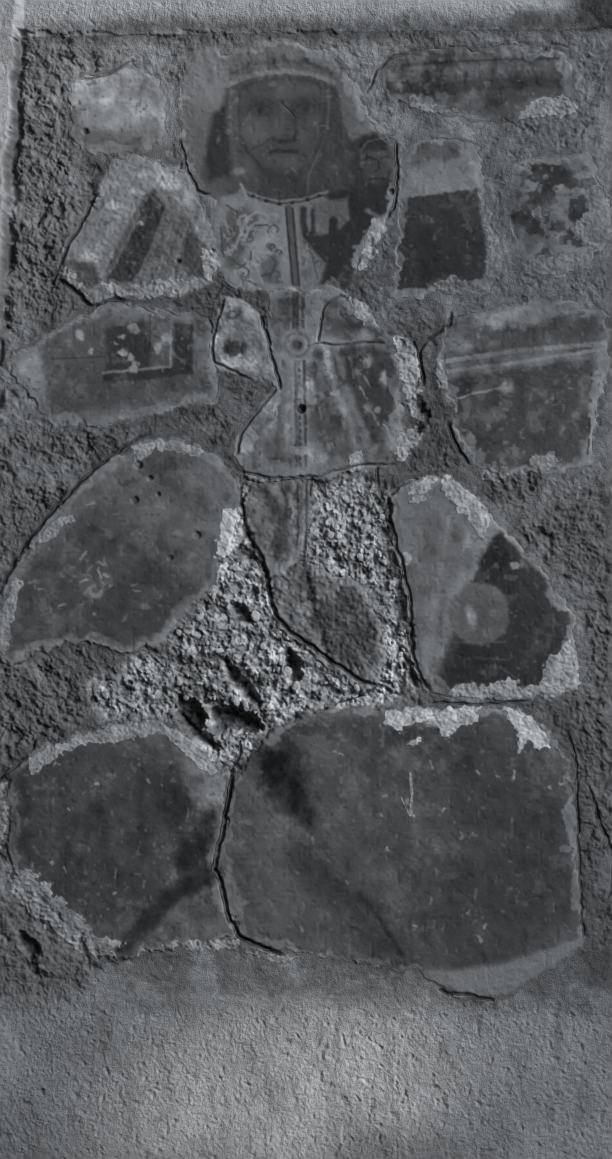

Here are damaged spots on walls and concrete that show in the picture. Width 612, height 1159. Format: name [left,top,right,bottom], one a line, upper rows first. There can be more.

peeling [358,217,387,271]
peeling [348,296,374,326]
peeling [393,335,431,462]
peeling [435,355,449,392]
peeling [130,438,205,466]
crack [212,295,529,710]
peeling [0,577,24,655]
spalling [27,450,581,776]
crack [212,742,282,956]